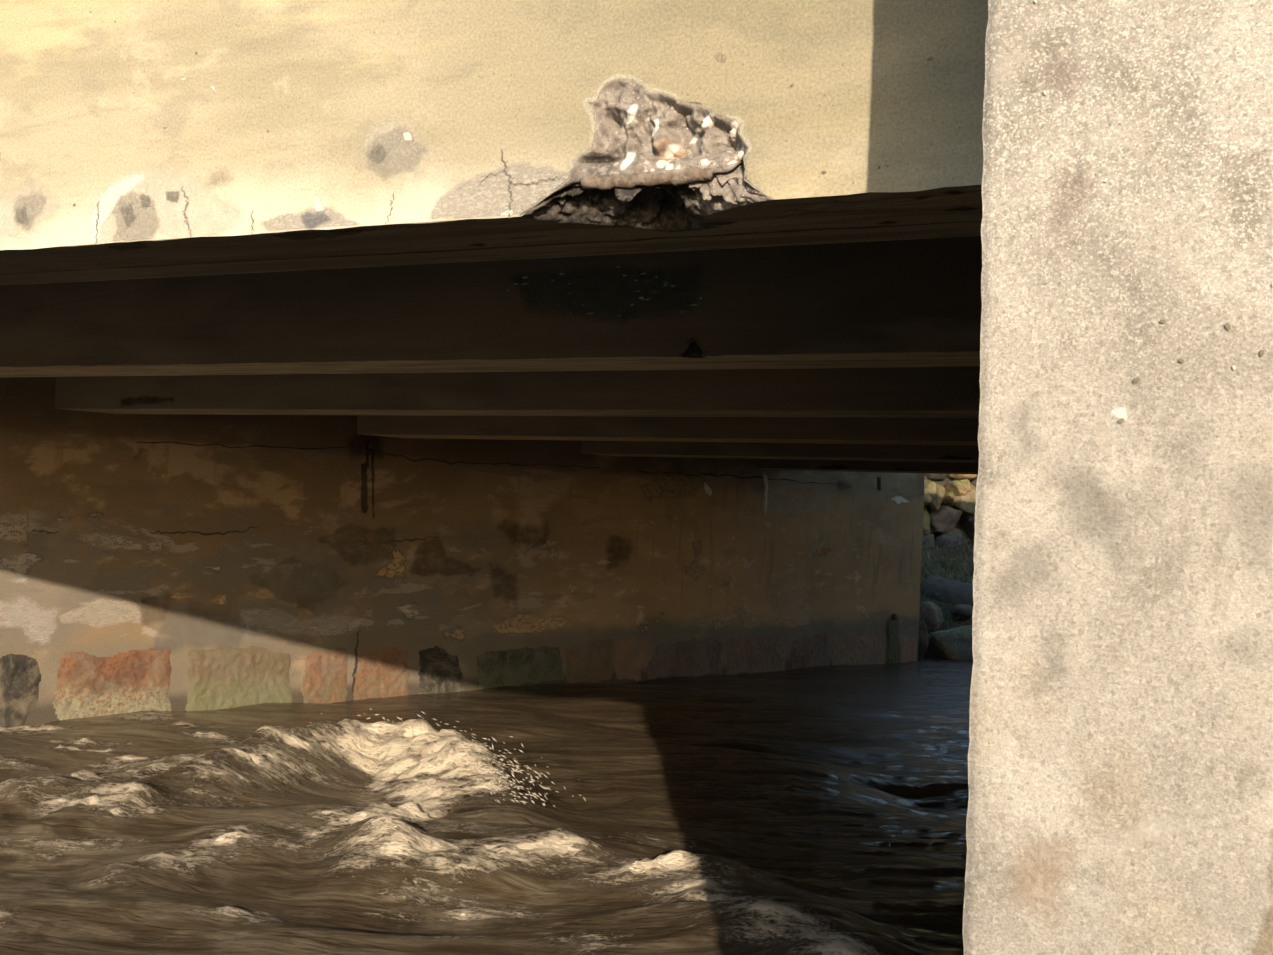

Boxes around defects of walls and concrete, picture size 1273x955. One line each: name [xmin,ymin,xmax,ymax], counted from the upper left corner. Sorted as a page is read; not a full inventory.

crack [181,185,191,238]
crack [479,149,562,219]
spalling [519,75,775,232]
leakage [0,595,190,644]